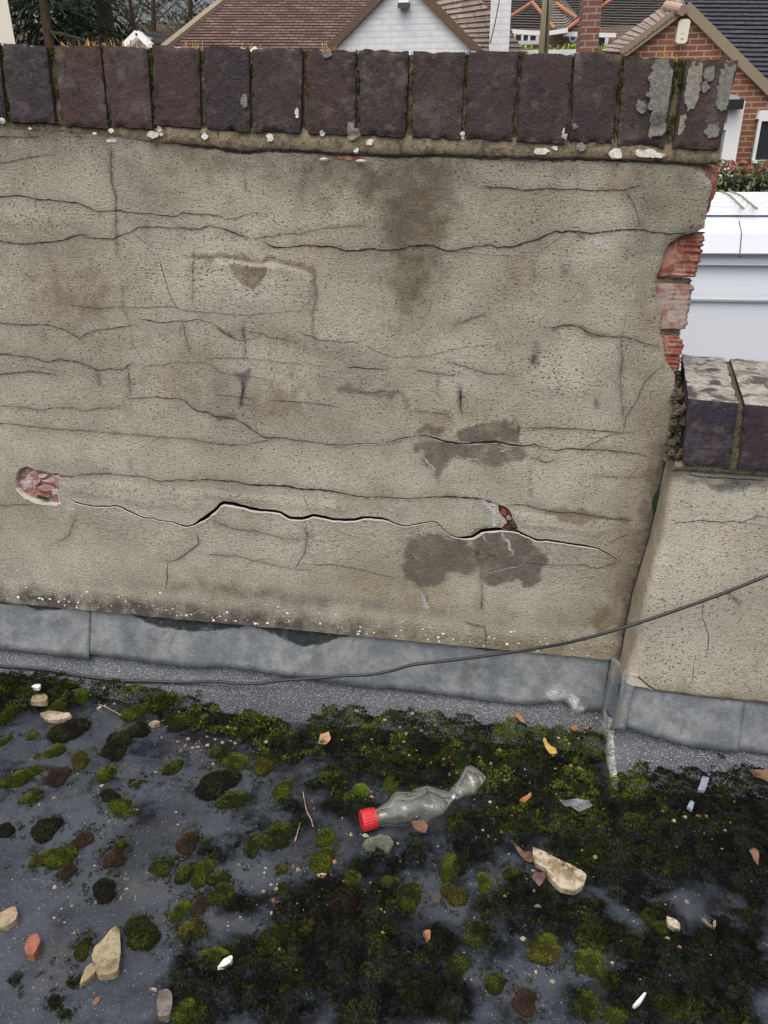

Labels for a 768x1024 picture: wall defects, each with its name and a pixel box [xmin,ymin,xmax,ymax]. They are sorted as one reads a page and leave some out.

crack [0,144,708,478]
flaking render [655,231,705,373]
spalling [15,466,74,506]
crack [58,445,768,660]
leakage [414,420,524,475]
leakage [403,500,547,608]
spalling [498,504,518,531]
leakage [133,615,350,646]